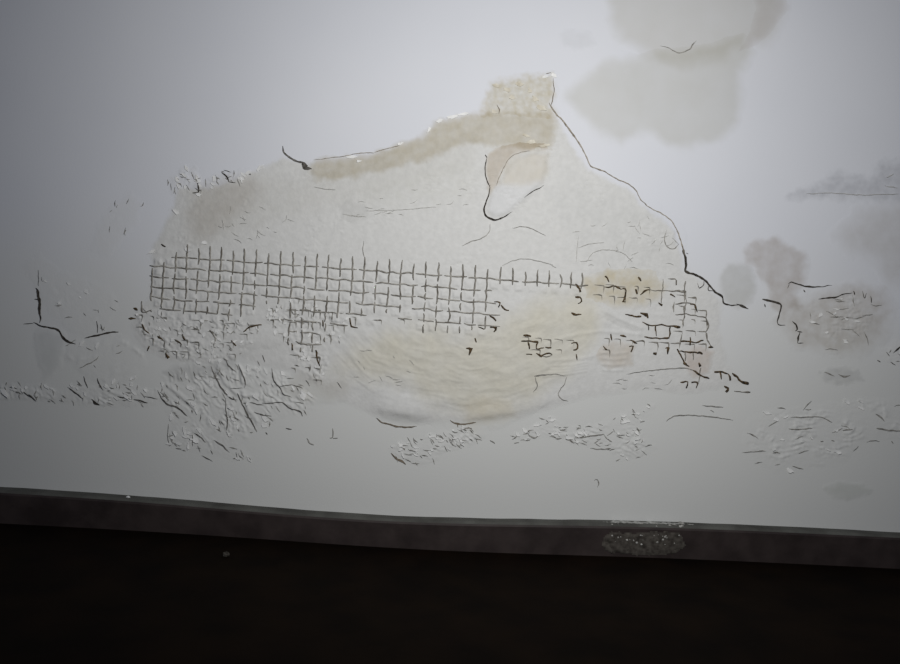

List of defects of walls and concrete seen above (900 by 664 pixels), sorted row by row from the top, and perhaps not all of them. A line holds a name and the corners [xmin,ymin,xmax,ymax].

leakage [558,0,793,154]
crack [464,151,544,245]
crack [546,72,872,343]
crack [26,272,334,461]
spalling [0,119,615,462]
peeling [388,419,481,470]
spalling [509,272,746,463]
peeling [739,394,900,475]
spalling [602,520,694,557]